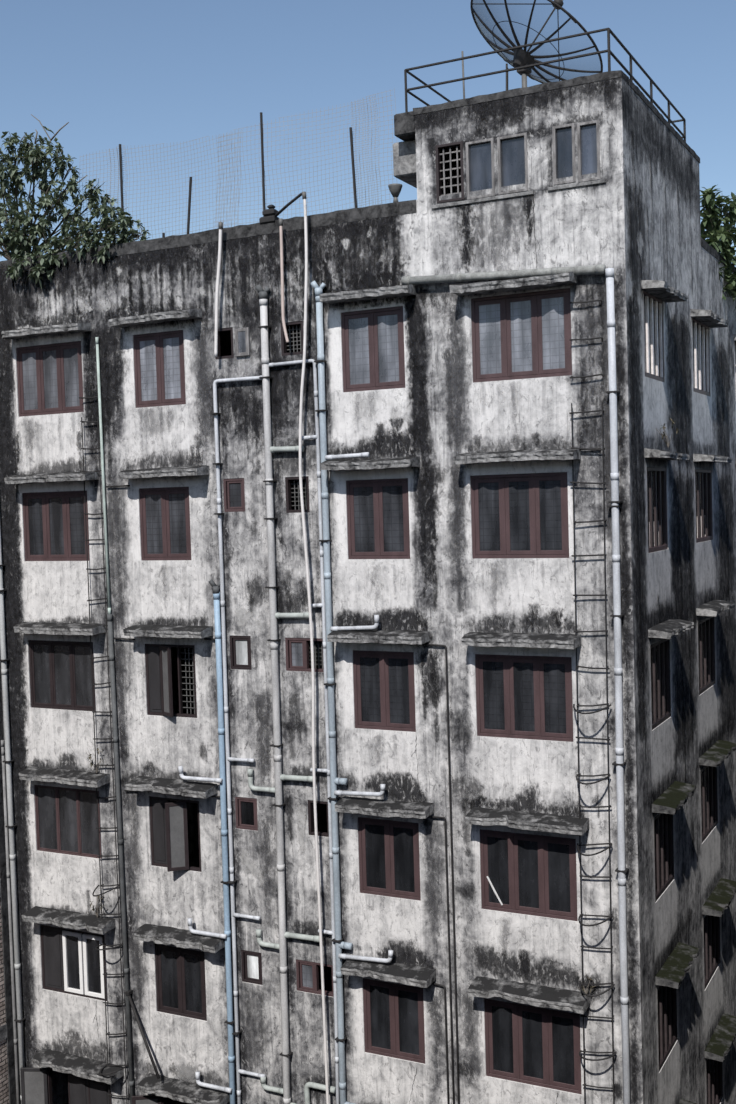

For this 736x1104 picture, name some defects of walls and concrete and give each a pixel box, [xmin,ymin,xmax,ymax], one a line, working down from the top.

leakage [0,205,466,1067]
leakage [414,78,736,1103]